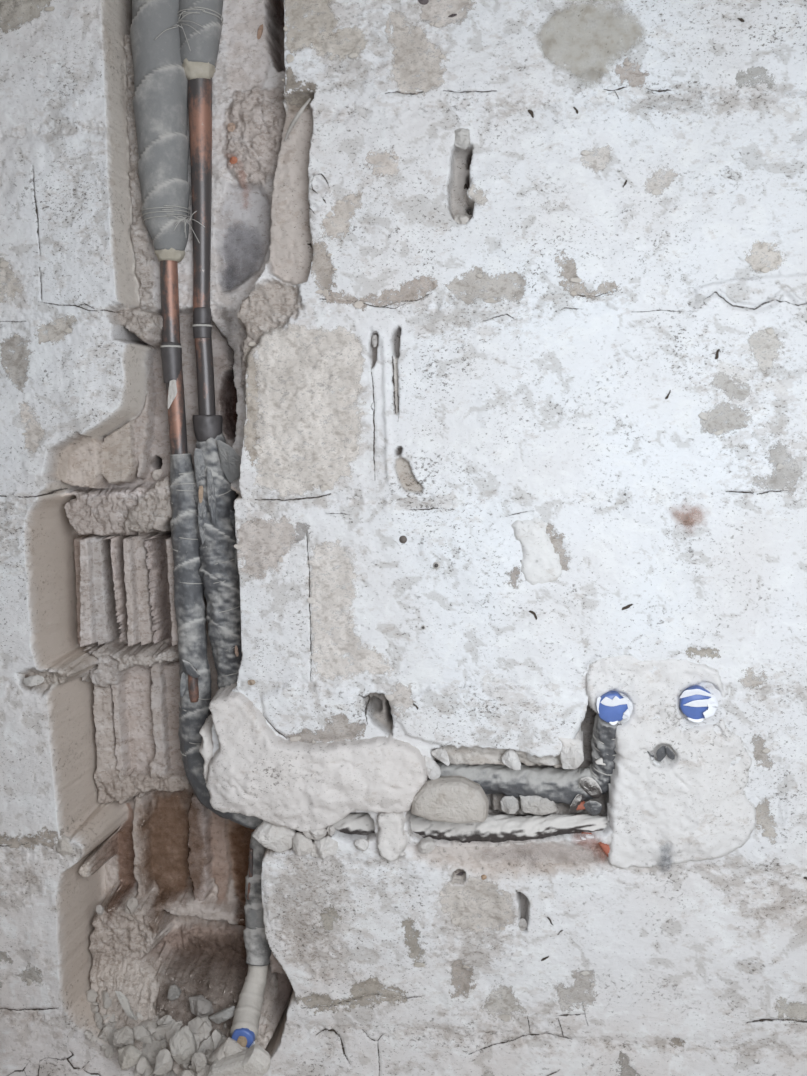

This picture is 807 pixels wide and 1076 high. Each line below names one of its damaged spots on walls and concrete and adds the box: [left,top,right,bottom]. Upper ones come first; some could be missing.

flaking render [0,0,55,39]
flaking render [615,58,649,89]
crack [33,174,118,313]
crack [707,292,805,310]
flaking render [0,315,77,454]
crack [0,488,68,498]
flaking render [287,713,366,743]
crack [1,1005,57,1013]
crack [303,994,421,1071]
crack [471,1007,588,1054]
crack [747,1017,807,1025]
crack [11,1052,100,1076]